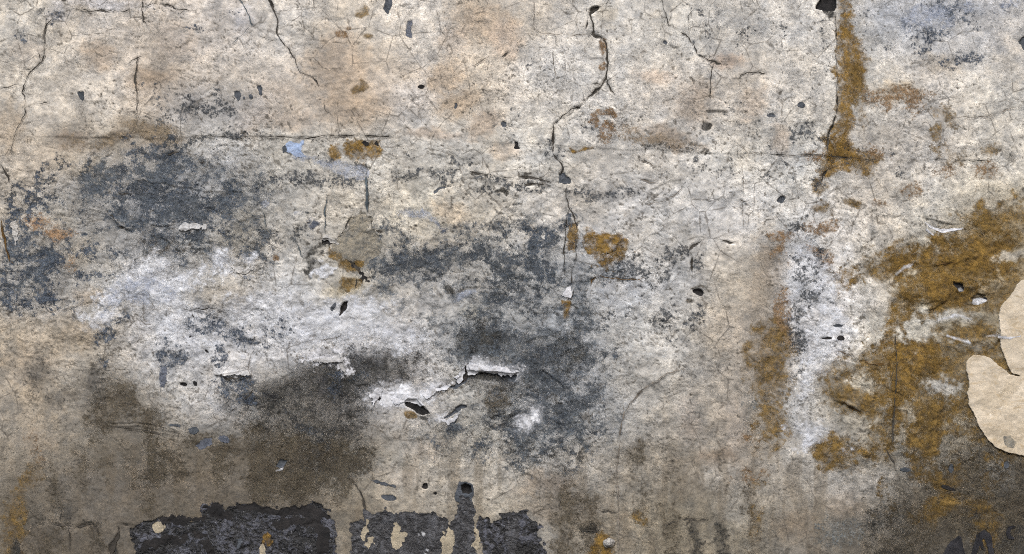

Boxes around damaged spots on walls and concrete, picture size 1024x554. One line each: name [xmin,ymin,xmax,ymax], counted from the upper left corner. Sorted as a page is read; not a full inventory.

crack [1,0,189,183]
crack [168,0,391,163]
corrosion [329,138,382,173]
water stain [0,80,713,554]
peeling [369,363,519,420]
peeling [441,405,467,425]
crack [458,0,646,299]
corrosion [566,223,628,269]
corrosion [742,286,798,451]
crack [689,15,879,271]
corrosion [767,0,1024,470]
spalling [1003,436,1016,448]